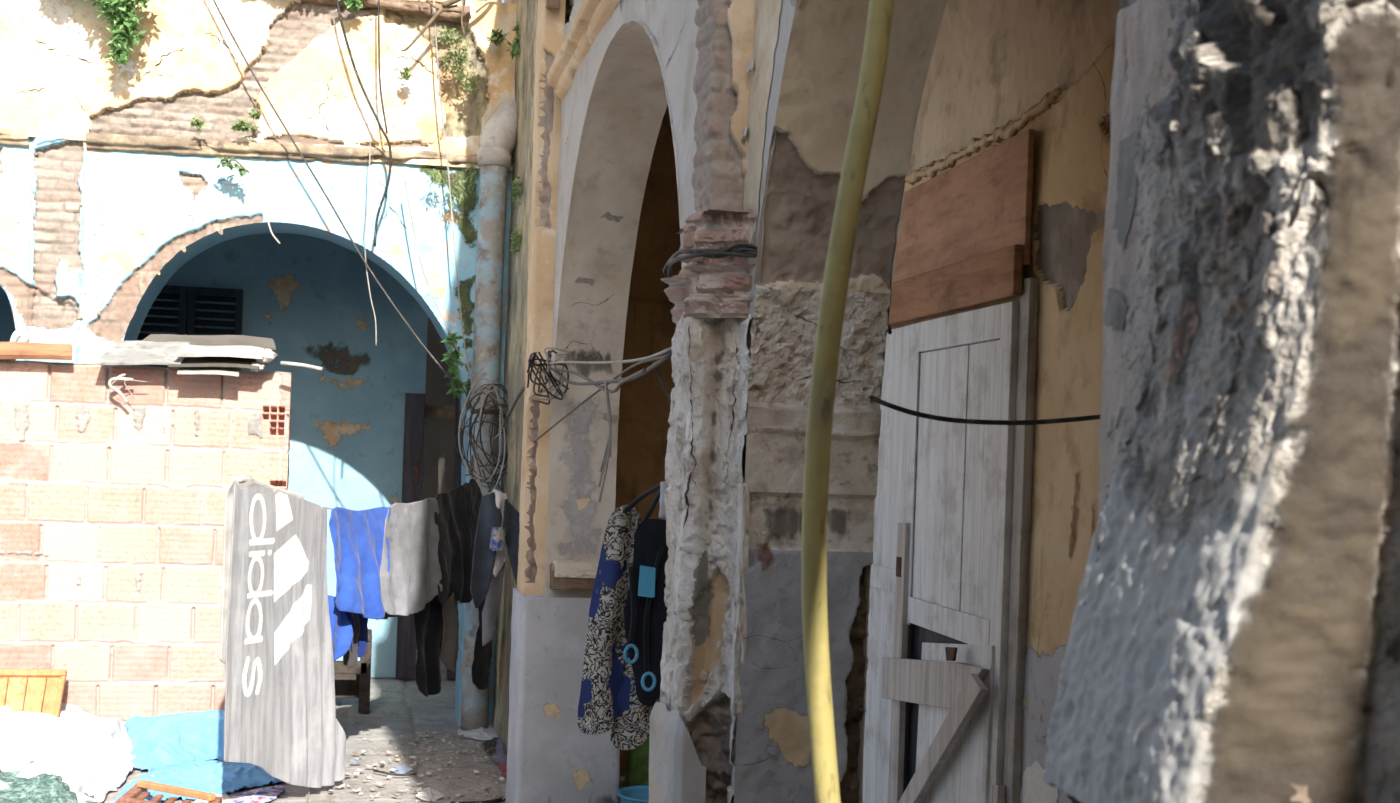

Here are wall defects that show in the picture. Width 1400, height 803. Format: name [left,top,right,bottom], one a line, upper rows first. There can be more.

flaking render [0,0,490,349]
flaking render [691,0,745,213]
flaking render [754,127,841,286]
flaking render [849,0,1120,289]
flaking render [1033,201,1106,311]
peeling [314,419,372,449]
peeling [763,707,811,767]